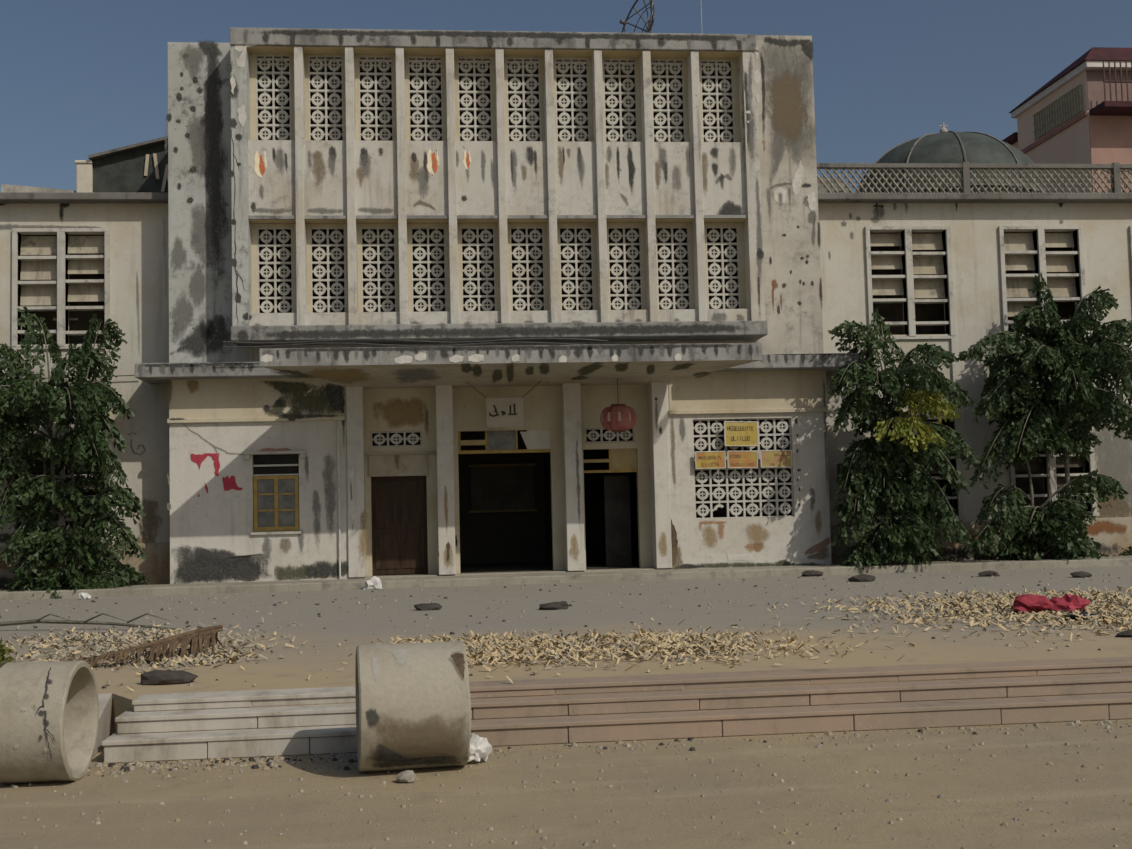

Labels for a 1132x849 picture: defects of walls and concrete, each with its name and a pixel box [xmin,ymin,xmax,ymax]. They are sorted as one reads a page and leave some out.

damp [138,37,861,435]
peeling [191,453,243,497]
damp [174,456,348,584]
crack [36,667,55,760]